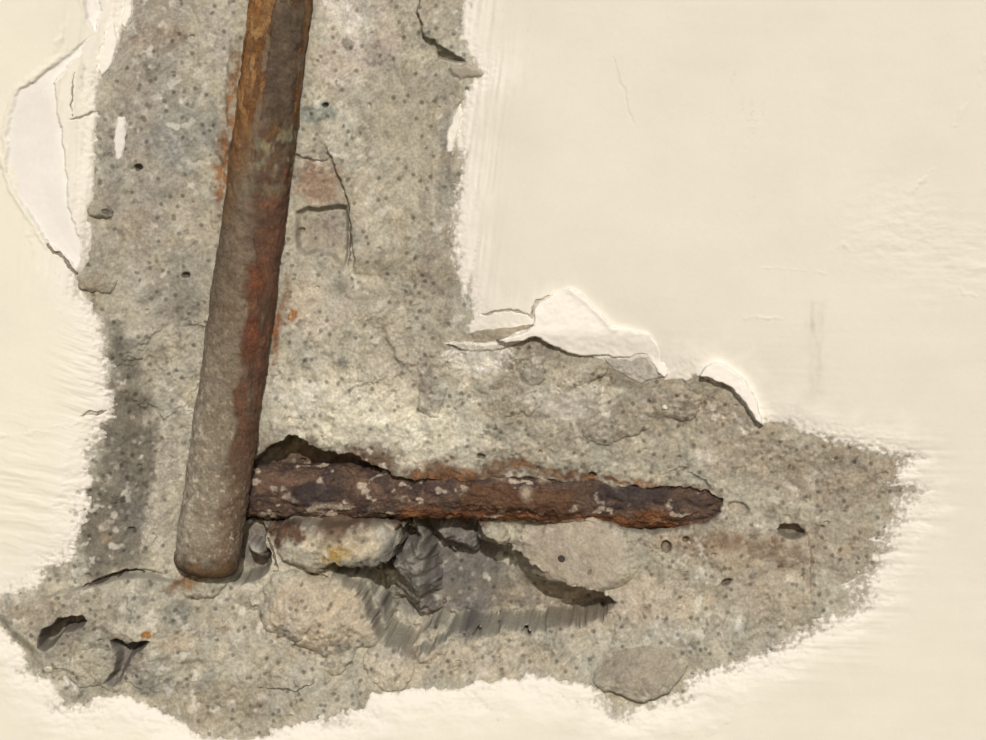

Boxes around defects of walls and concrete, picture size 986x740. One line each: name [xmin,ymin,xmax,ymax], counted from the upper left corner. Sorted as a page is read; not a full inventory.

rust [214,0,276,201]
spalling [0,0,417,740]
rust [230,137,297,455]
spalling [254,0,916,694]
rust [268,518,306,547]
rust [413,458,667,487]
rust [403,510,681,528]
spalling [604,692,669,718]